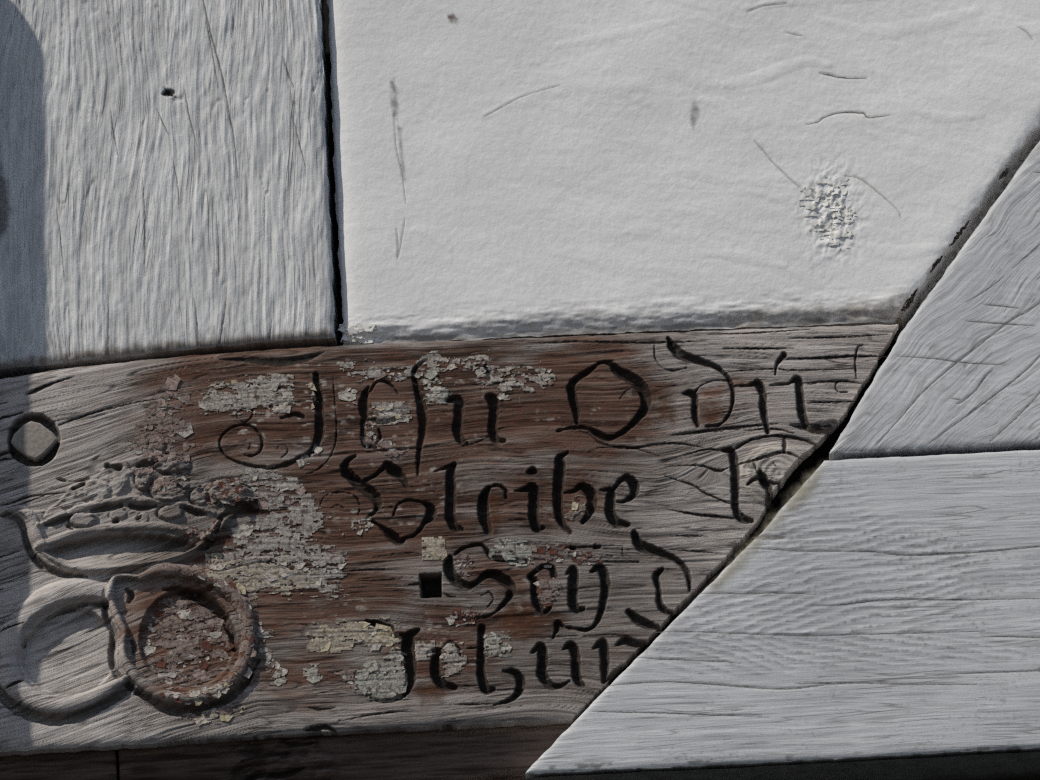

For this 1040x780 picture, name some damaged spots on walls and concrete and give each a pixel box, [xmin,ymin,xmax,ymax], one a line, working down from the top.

spalling [798,174,857,249]
spalling [338,321,383,346]
peeling [337,349,555,406]
peeling [125,373,318,498]
peeling [360,401,412,457]
peeling [138,444,374,727]
peeling [422,536,474,577]
peeling [488,537,602,607]
peeling [303,616,467,703]
peeling [446,604,483,627]
peeling [483,631,512,657]